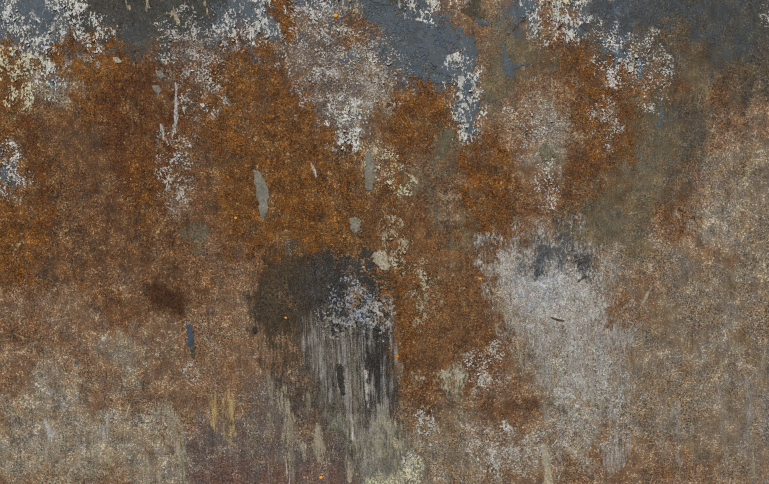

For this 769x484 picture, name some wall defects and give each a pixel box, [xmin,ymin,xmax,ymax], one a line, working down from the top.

corrosion [0,31,60,298]
peeling [155,129,197,212]
peeling [0,0,488,205]
peeling [253,169,269,222]
corrosion [45,21,522,384]
peeling [316,276,378,340]
peeling [349,216,361,233]
peeling [372,208,443,333]
corrosion [552,37,654,205]
leakage [277,304,411,483]